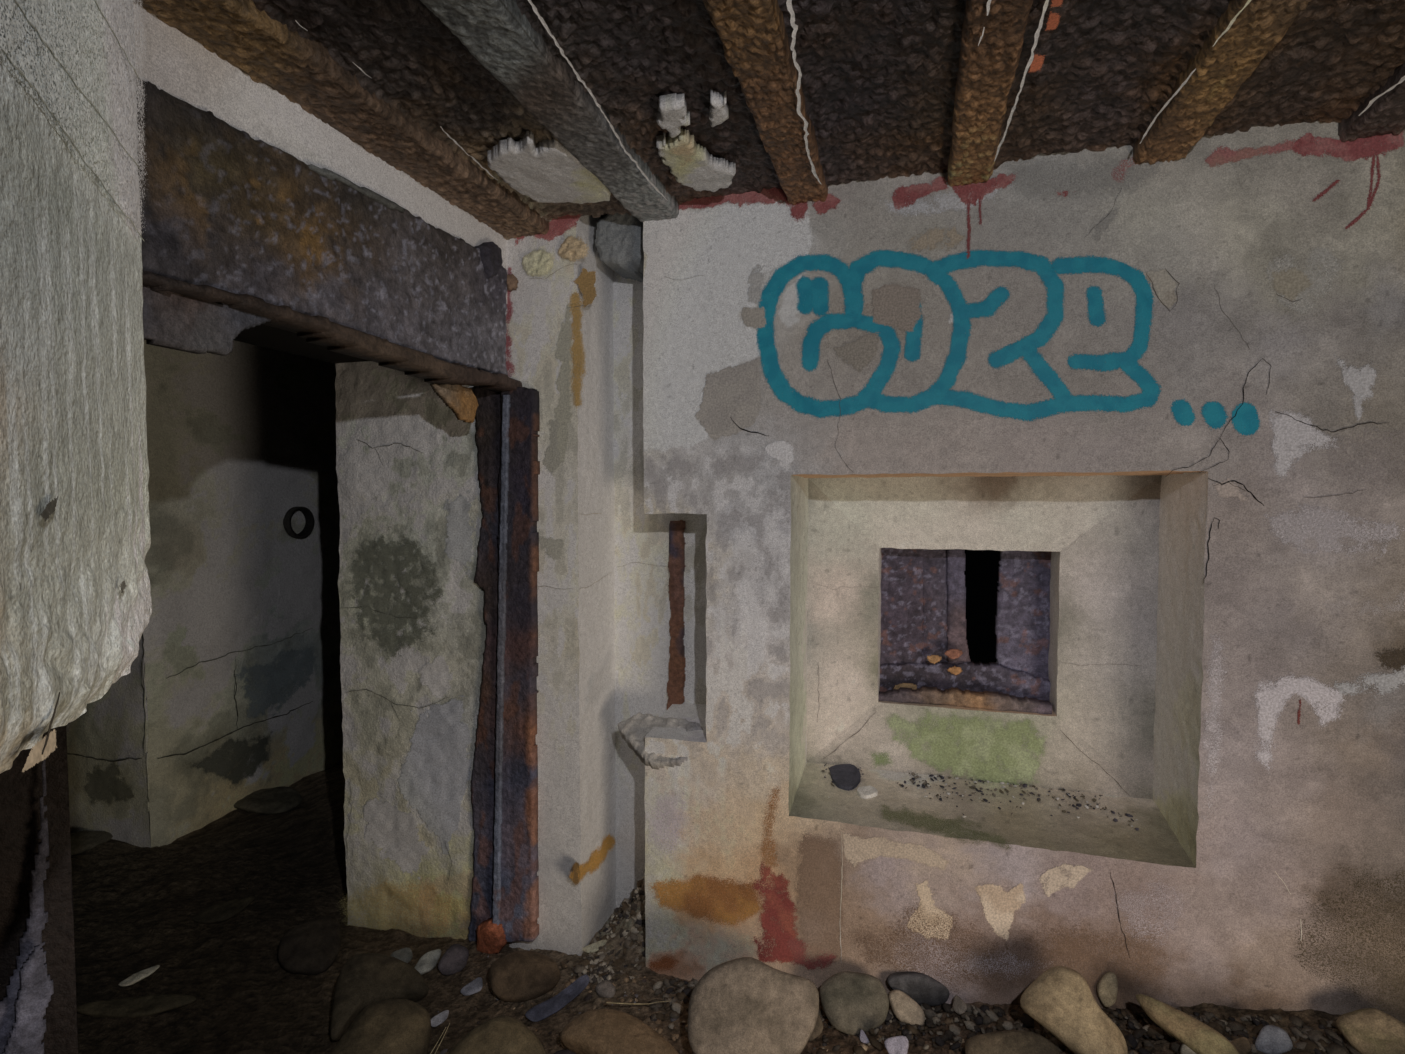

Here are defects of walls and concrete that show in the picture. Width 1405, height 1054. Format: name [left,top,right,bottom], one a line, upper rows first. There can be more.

crack [1169,289,1389,504]
crack [42,628,313,762]
leakage [342,526,450,667]
crack [346,689,447,717]
corrosion [667,520,686,710]
corrosion [927,649,963,675]
crack [1203,518,1220,583]
corrosion [568,833,615,886]
corrosion [645,786,783,928]
flaking render [975,882,1027,941]
flaking render [1039,863,1094,897]
leakage [1288,856,1405,1021]